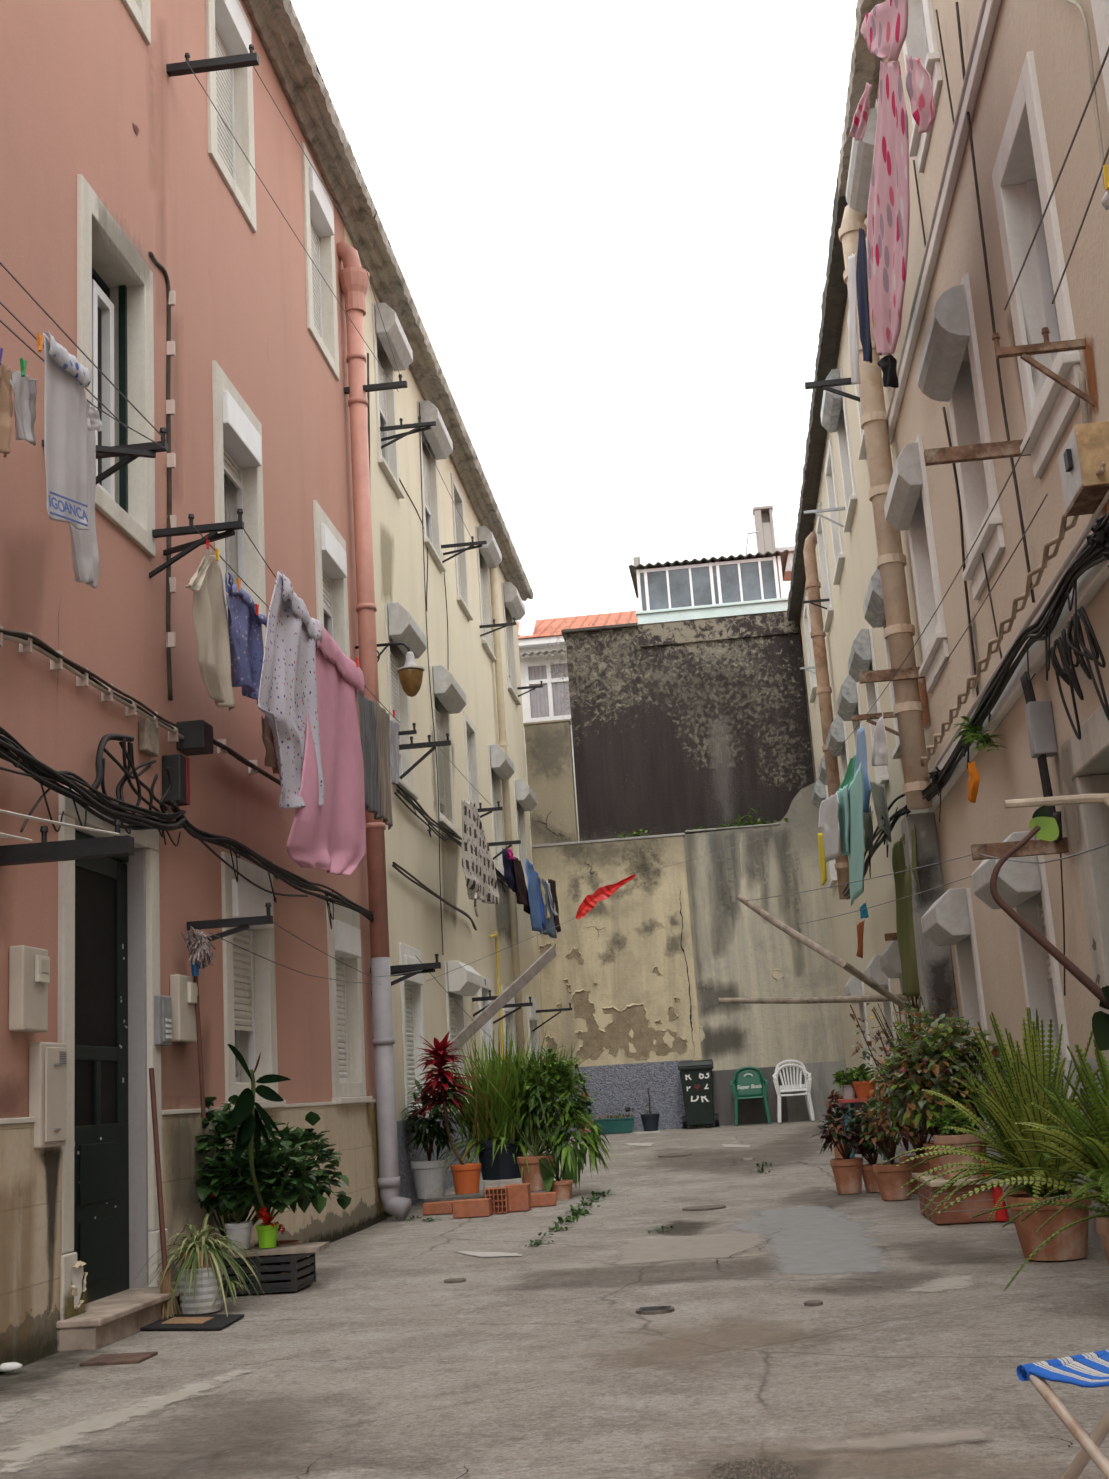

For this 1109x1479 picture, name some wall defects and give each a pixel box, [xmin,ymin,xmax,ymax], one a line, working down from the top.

peeling [539,942,584,965]
peeling [556,978,706,1061]
leakage [42,1149,61,1278]
leakage [49,1289,87,1320]
leakage [0,1338,56,1375]